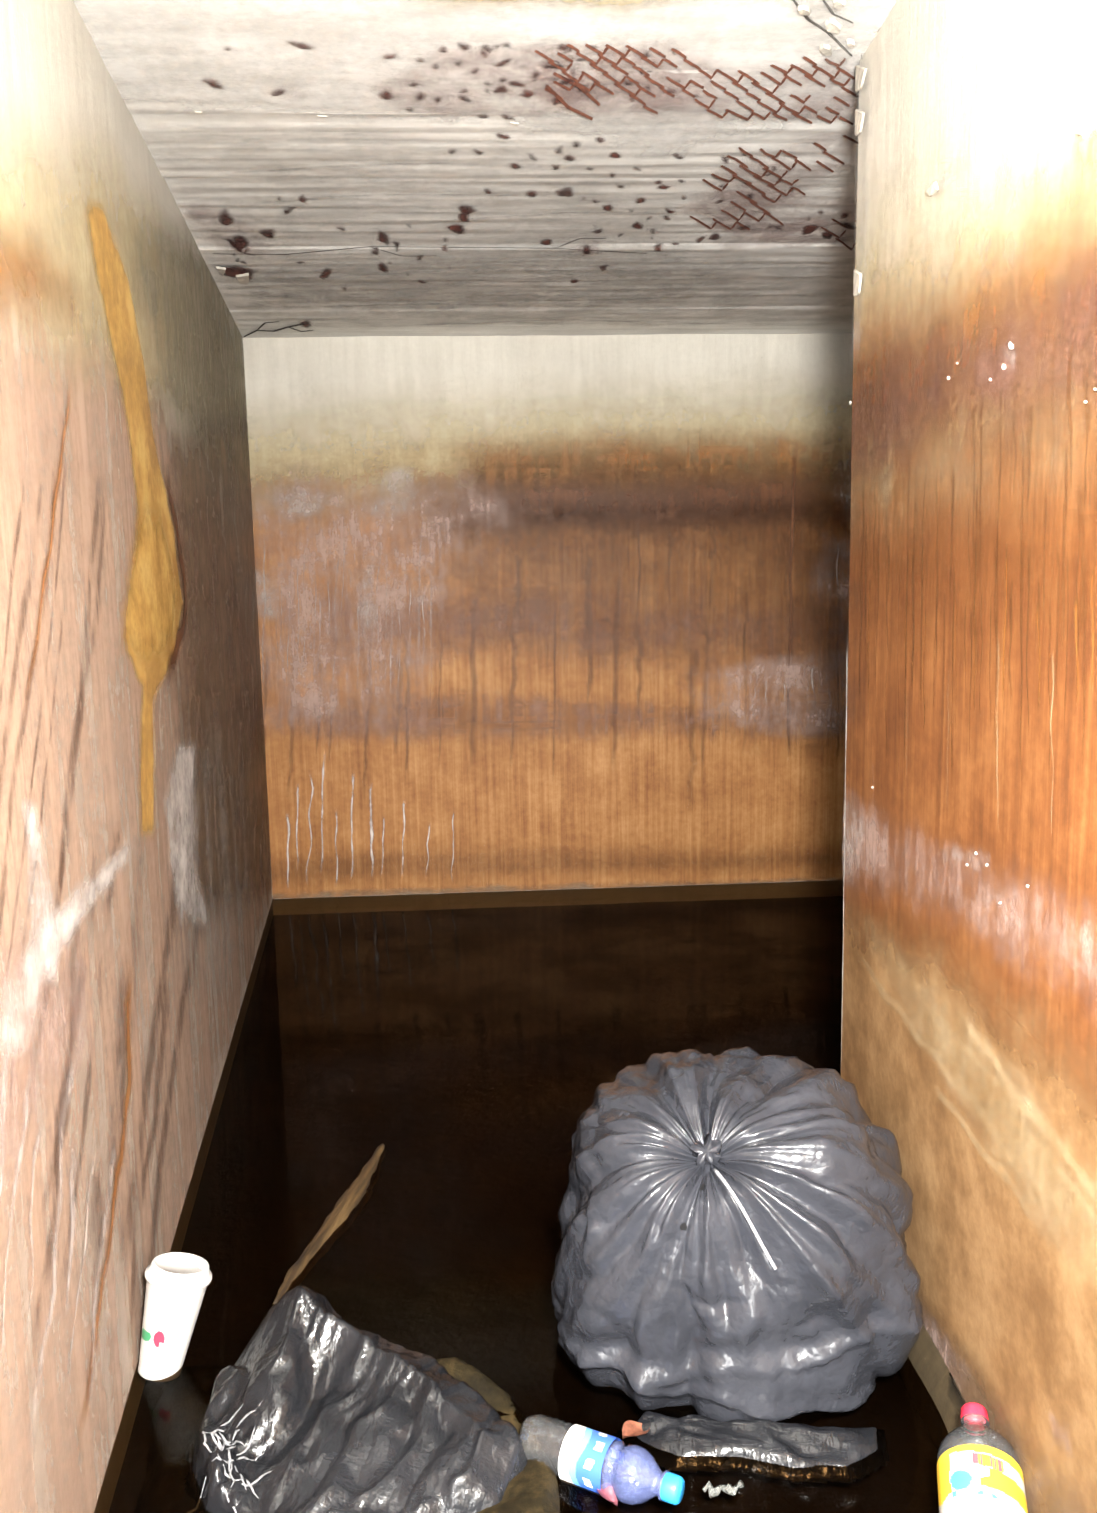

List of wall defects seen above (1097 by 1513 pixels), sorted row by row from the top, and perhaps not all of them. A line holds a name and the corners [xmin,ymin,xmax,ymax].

leakage [88,179,173,389]
corrosion [620,180,684,251]
corrosion [803,212,856,239]
leakage [208,887,241,1059]